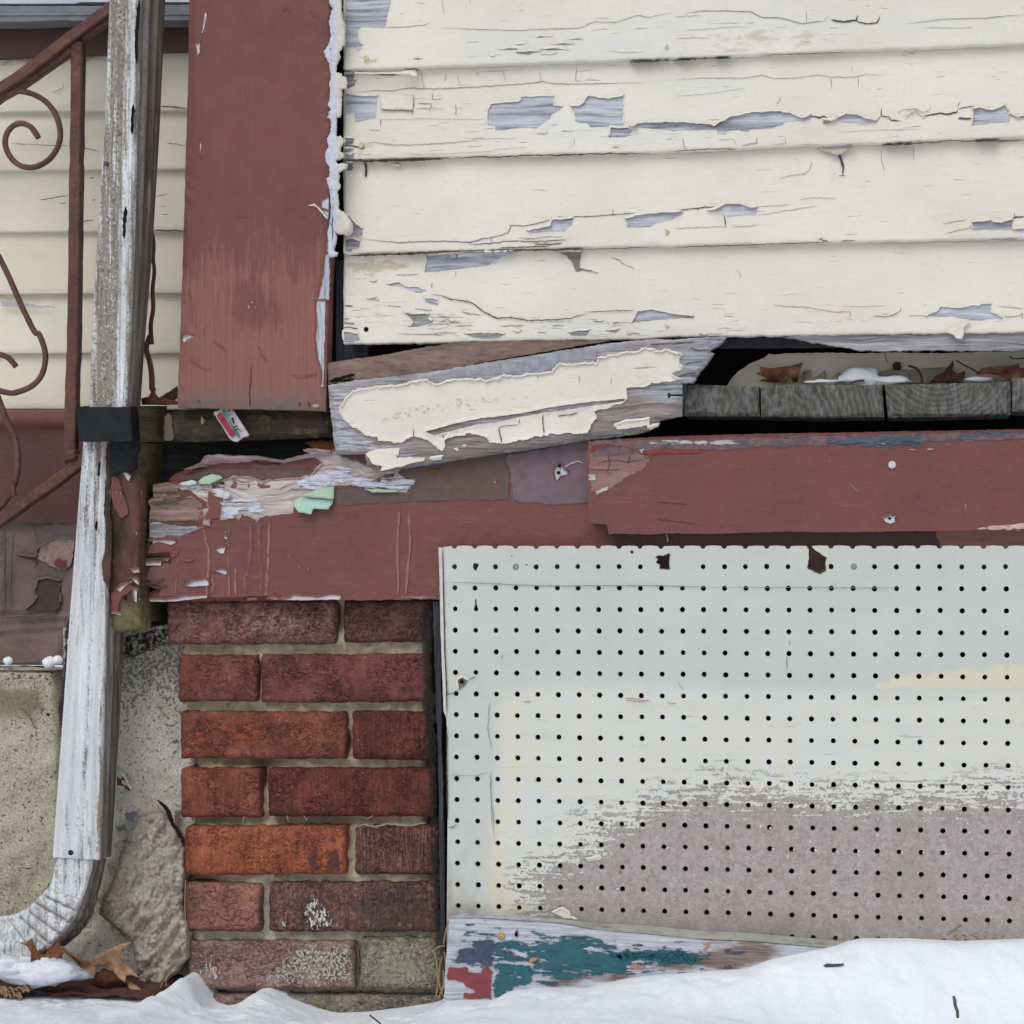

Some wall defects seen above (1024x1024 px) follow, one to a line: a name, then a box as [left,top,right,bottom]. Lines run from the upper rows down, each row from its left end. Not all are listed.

peeling [343,0,391,51]
crack [387,2,880,42]
crack [916,14,1023,29]
crack [678,74,877,105]
peeling [485,93,877,137]
crack [676,101,974,229]
peeling [314,251,332,387]
crack [773,304,917,318]
peeling [586,418,738,495]
peeling [294,487,334,514]
peeling [115,558,228,602]
peeling [447,924,711,1000]